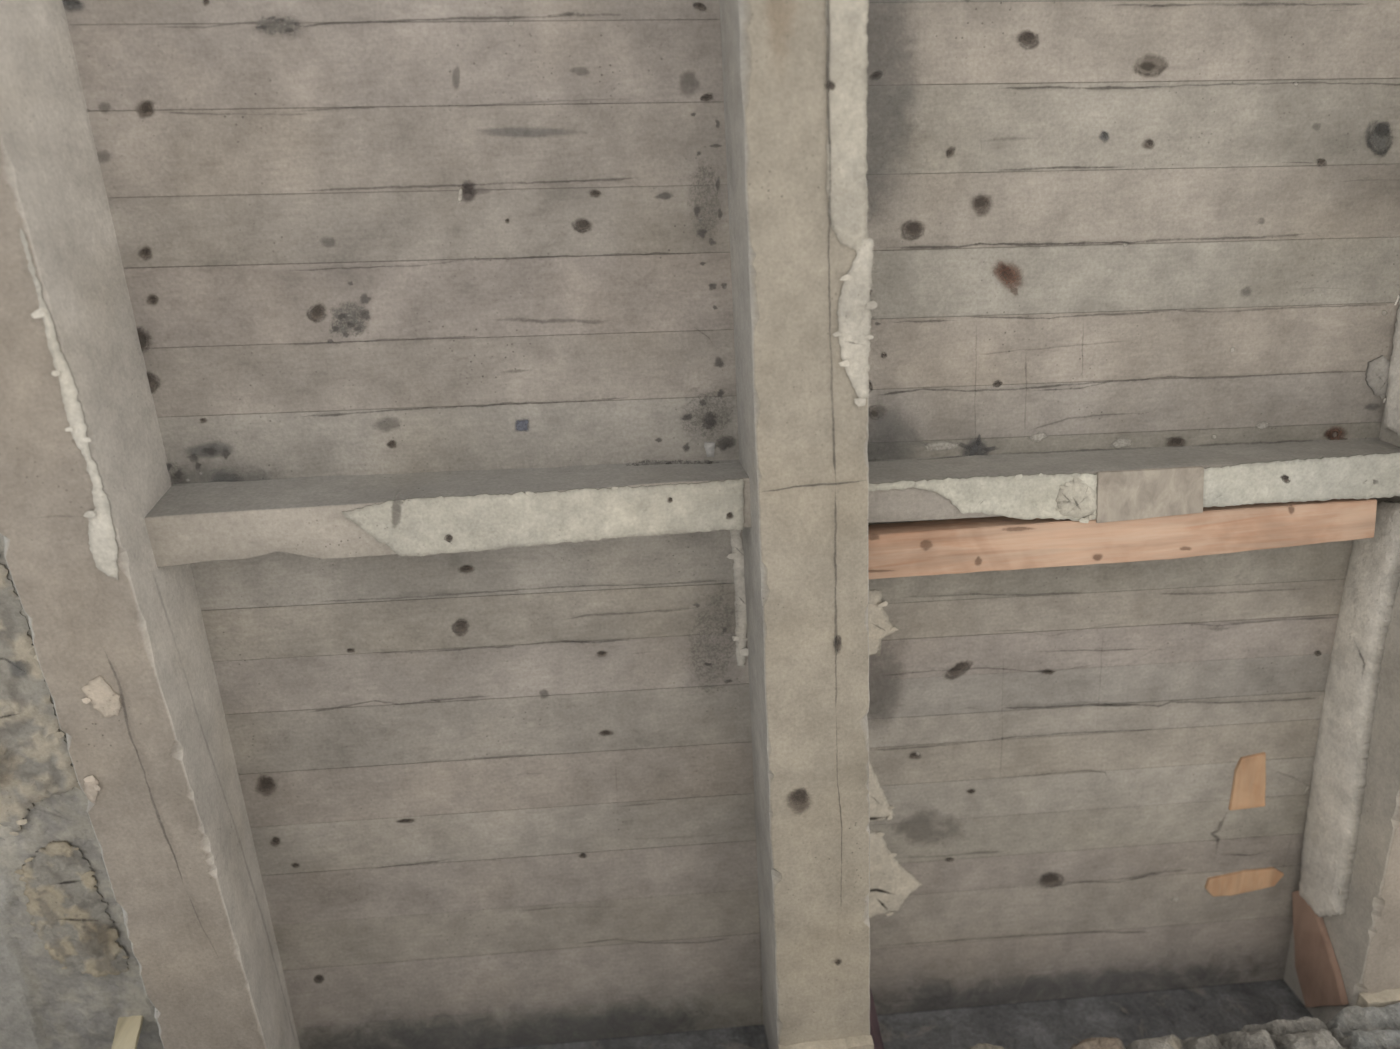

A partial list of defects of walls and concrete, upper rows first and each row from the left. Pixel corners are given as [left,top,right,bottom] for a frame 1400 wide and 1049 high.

peeling [832,238,887,406]
water stain [904,222,924,239]
rust [994,263,1021,286]
peeling [20,228,119,580]
peeling [0,564,101,836]
peeling [868,590,898,656]
peeling [868,761,922,918]